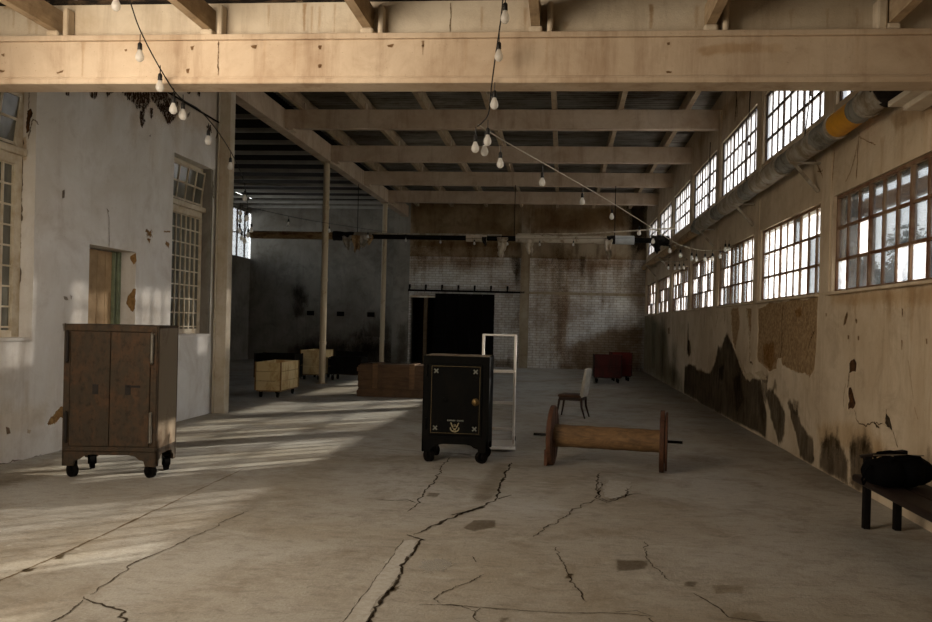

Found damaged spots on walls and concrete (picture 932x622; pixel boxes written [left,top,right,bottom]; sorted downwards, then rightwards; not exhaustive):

peeling [123,92,189,136]
flaking render [43,404,63,429]
flaking render [730,293,827,381]
water stain [684,334,873,490]
flaking render [843,358,857,412]
crack [51,511,247,622]
crack [366,458,512,622]
crack [533,473,639,600]